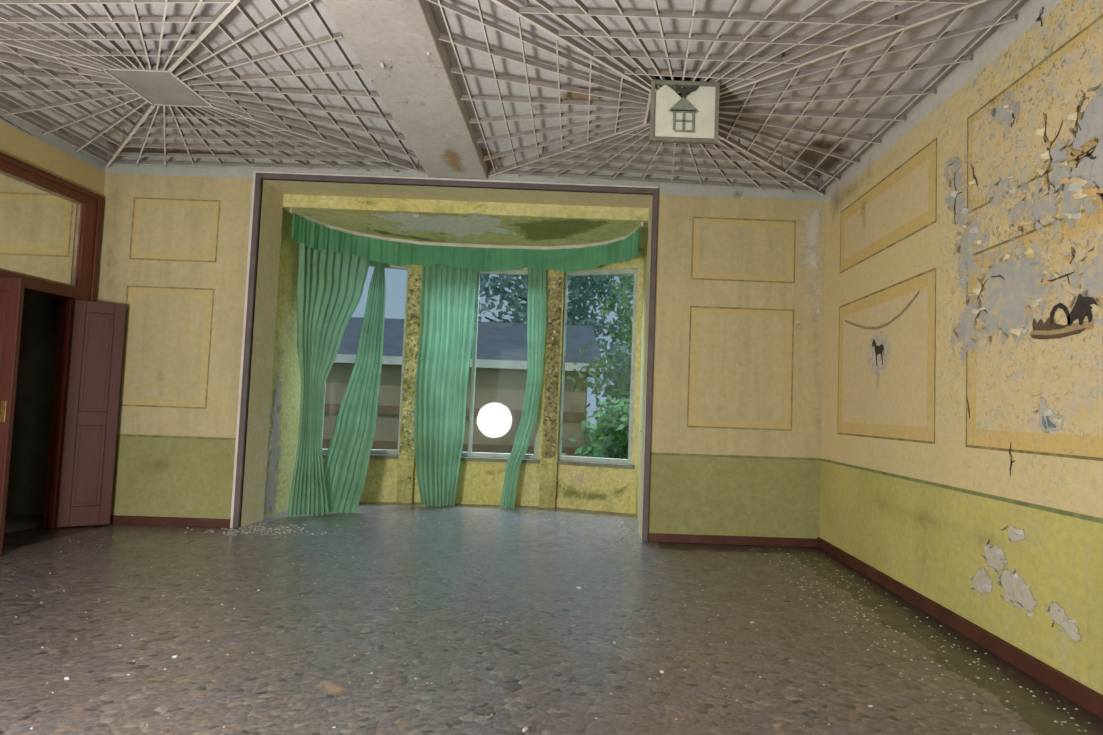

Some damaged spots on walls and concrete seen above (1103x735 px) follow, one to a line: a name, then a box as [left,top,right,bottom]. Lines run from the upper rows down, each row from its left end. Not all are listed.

crack [1011,93,1103,206]
peeling [943,82,1103,368]
spalling [1033,394,1064,435]
spalling [970,524,1081,642]